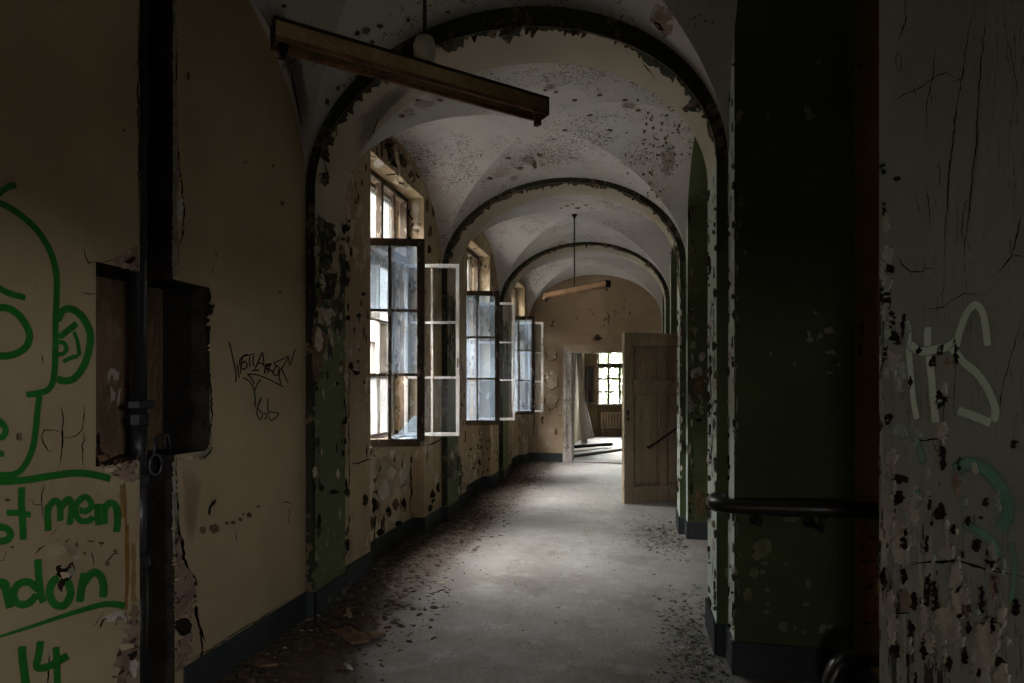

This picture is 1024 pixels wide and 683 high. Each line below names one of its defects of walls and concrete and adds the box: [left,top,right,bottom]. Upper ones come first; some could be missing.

crack [177,123,185,273]
peeling [312,79,389,187]
crack [889,0,1023,309]
peeling [311,214,366,497]
peeling [436,24,772,634]
peeling [879,202,959,395]
spalling [96,432,140,483]
spalling [171,290,215,672]
spalling [363,468,410,537]
peeling [860,381,1021,683]
spalling [100,601,140,683]